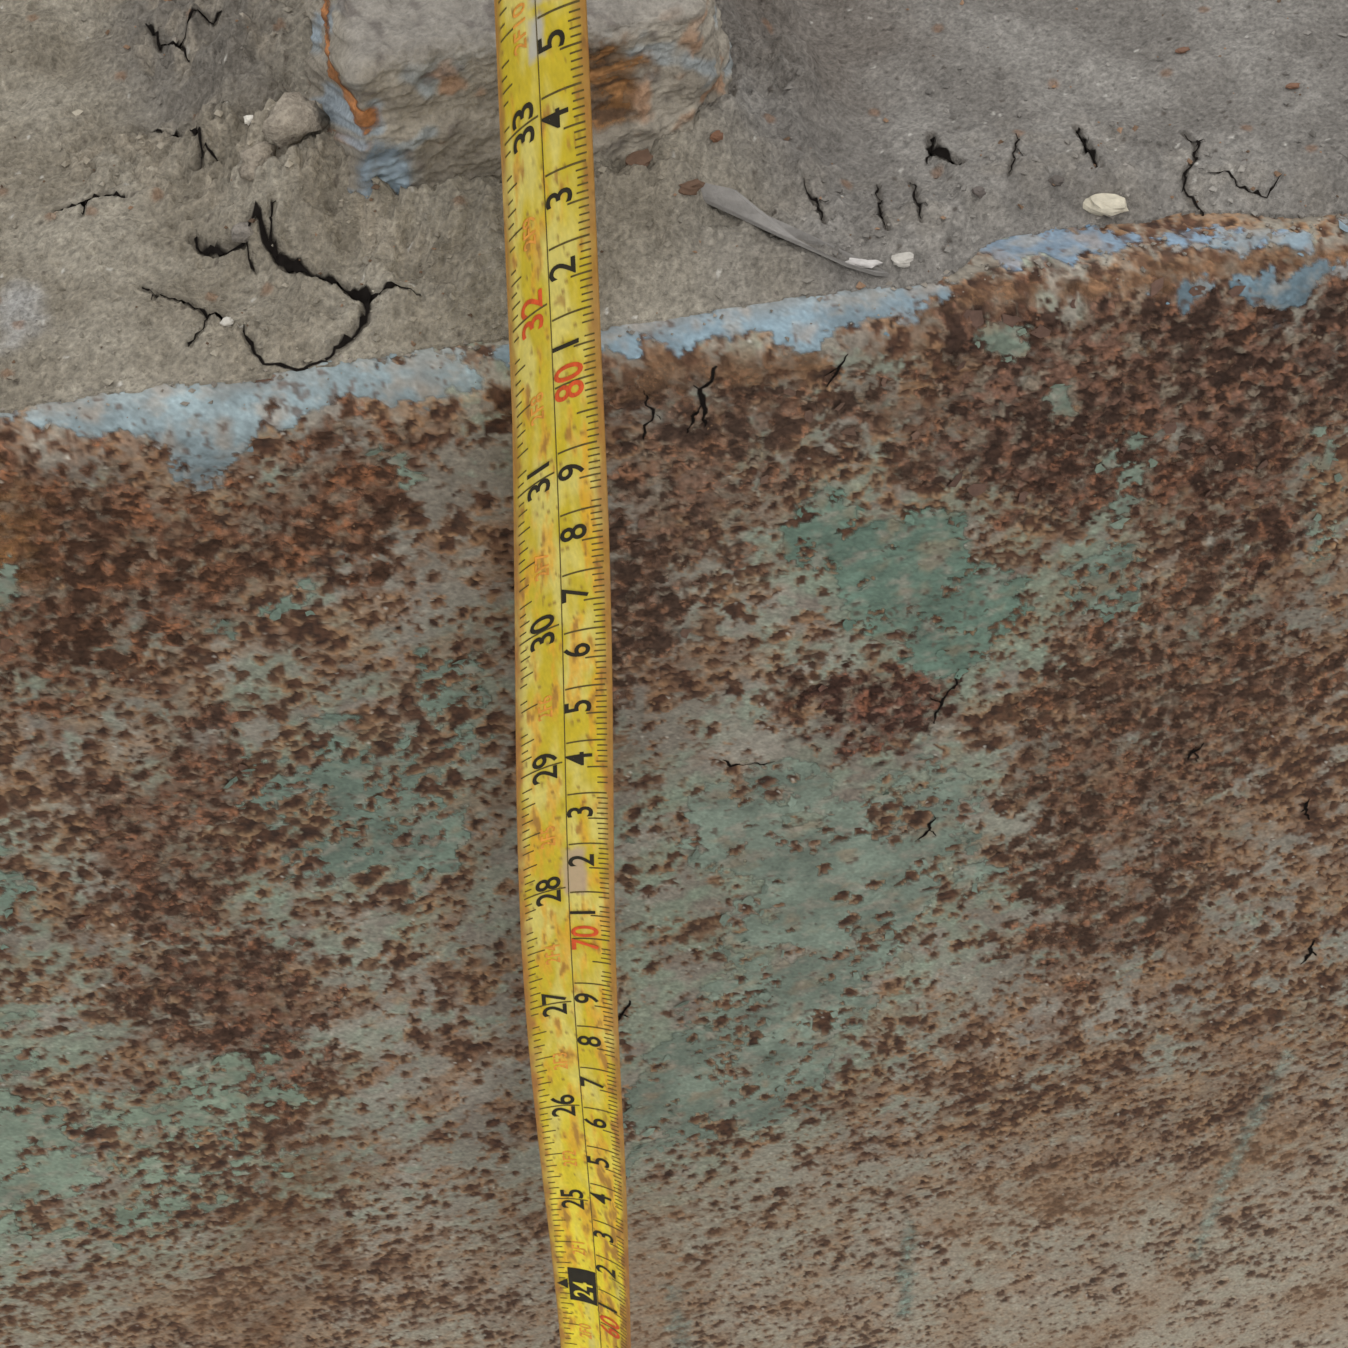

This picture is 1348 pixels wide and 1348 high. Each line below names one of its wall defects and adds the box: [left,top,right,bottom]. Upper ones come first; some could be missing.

crack [56,191,125,215]
crack [142,201,421,372]
corrosion [588,43,649,128]
crack [1182,134,1283,216]
peeling [0,347,482,491]
crack [642,366,718,440]
corrosion [0,393,425,751]
peeling [774,479,1035,679]
corrosion [602,246,1348,996]
corrosion [53,701,363,1146]
peeling [623,754,1008,1178]
peeling [0,1045,318,1250]